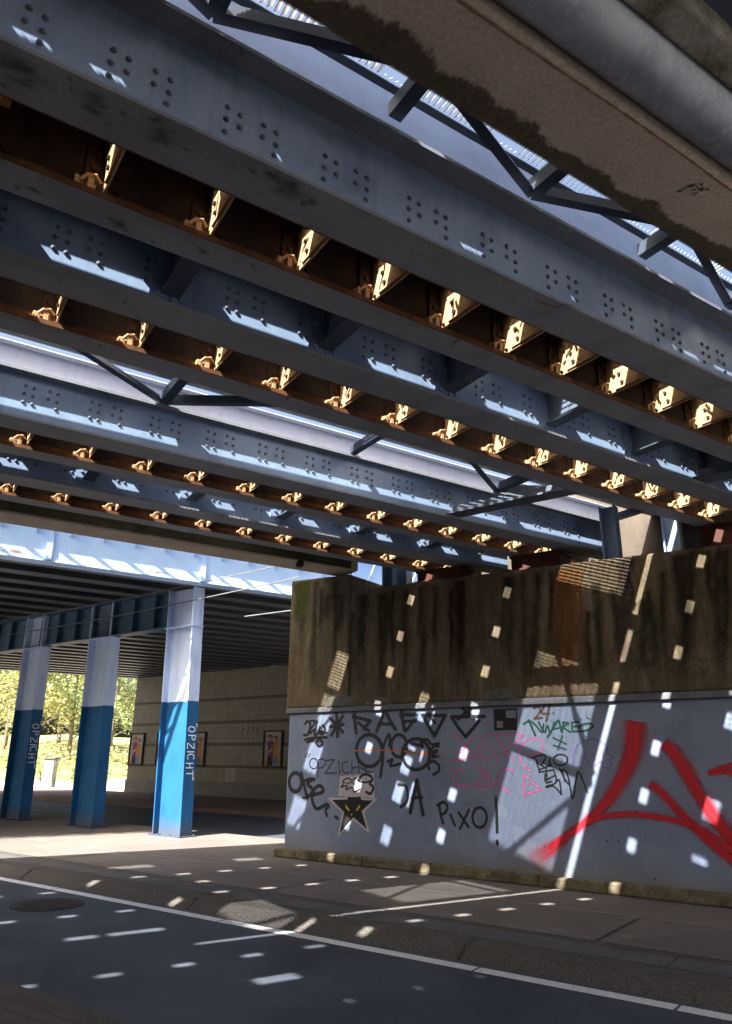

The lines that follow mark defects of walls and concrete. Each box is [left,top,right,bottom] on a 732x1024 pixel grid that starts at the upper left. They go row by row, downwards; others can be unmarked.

water stain [280,0,732,273]
water stain [295,580,438,668]
water stain [488,573,553,661]
water stain [586,551,729,663]